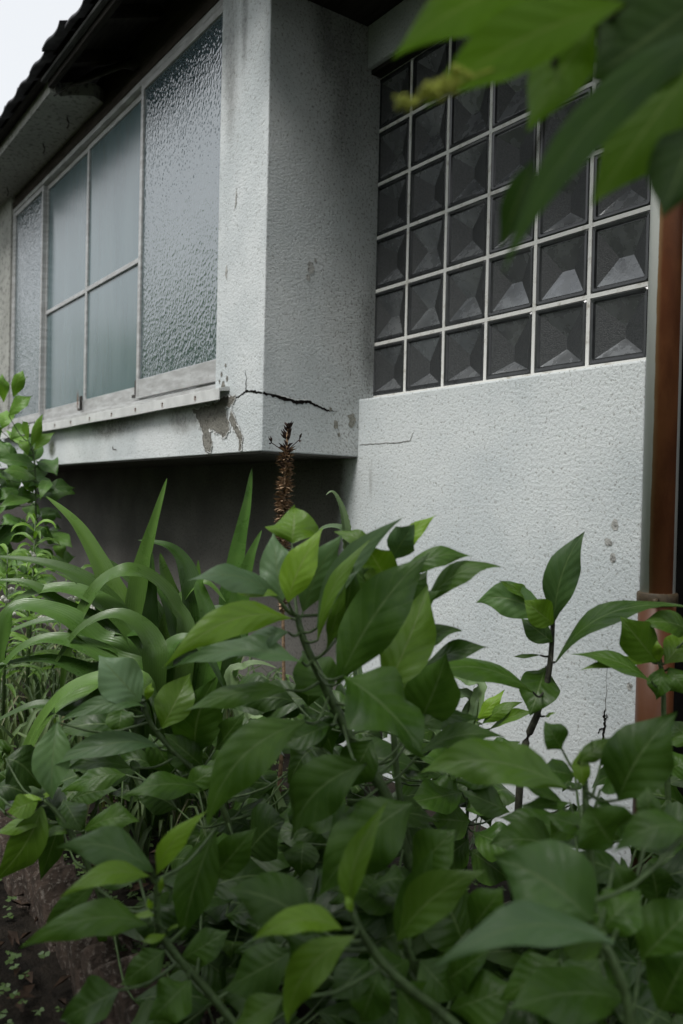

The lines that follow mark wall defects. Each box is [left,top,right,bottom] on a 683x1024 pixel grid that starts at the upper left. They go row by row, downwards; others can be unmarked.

peeling [190,364,243,454]
crack [220,370,334,412]